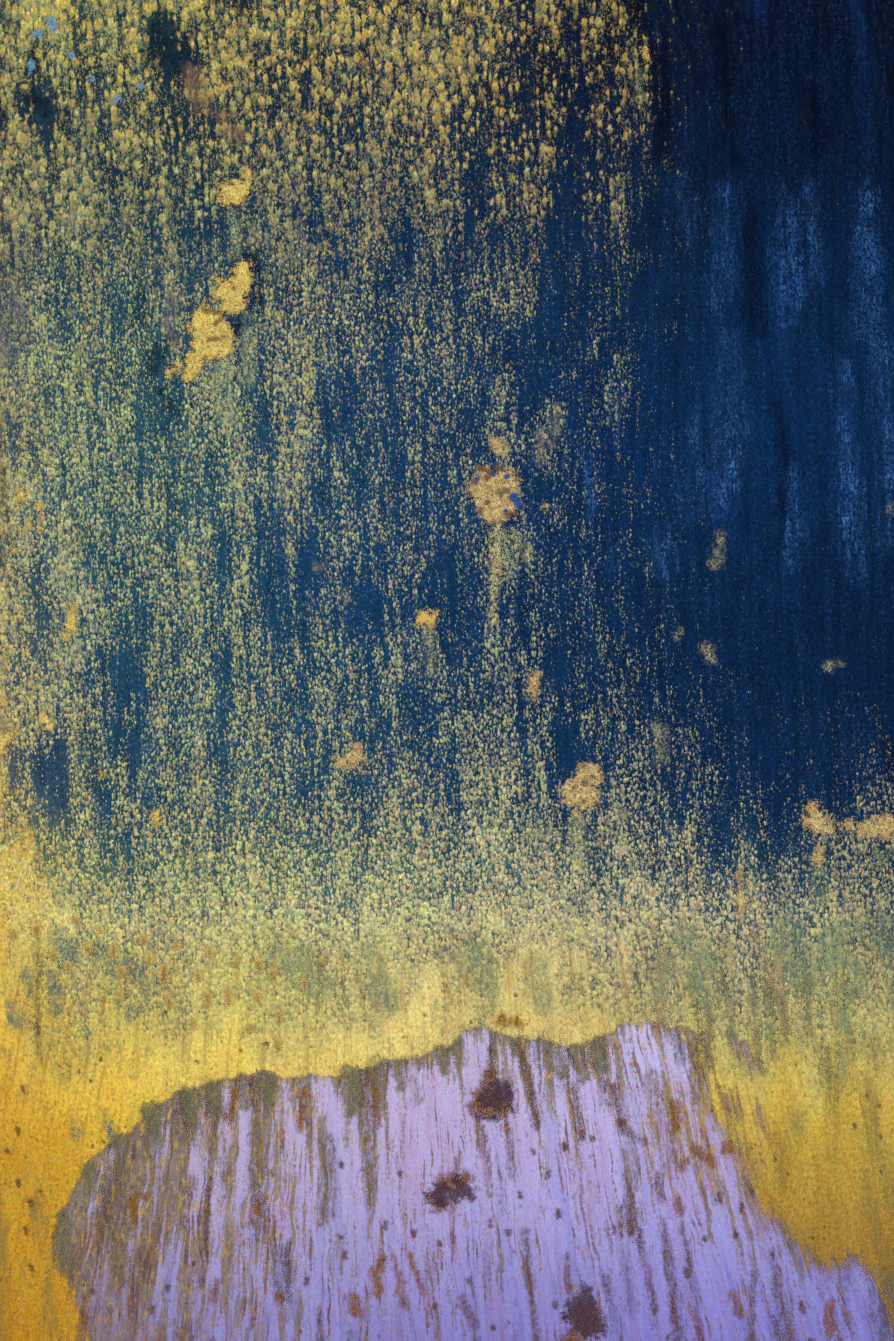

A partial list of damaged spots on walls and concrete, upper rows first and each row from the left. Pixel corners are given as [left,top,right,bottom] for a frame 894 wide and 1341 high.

corrosion [466,1012,540,1161]
corrosion [423,1158,477,1212]
peeling [51,1021,894,1341]
corrosion [489,1220,535,1305]
corrosion [552,1253,608,1341]